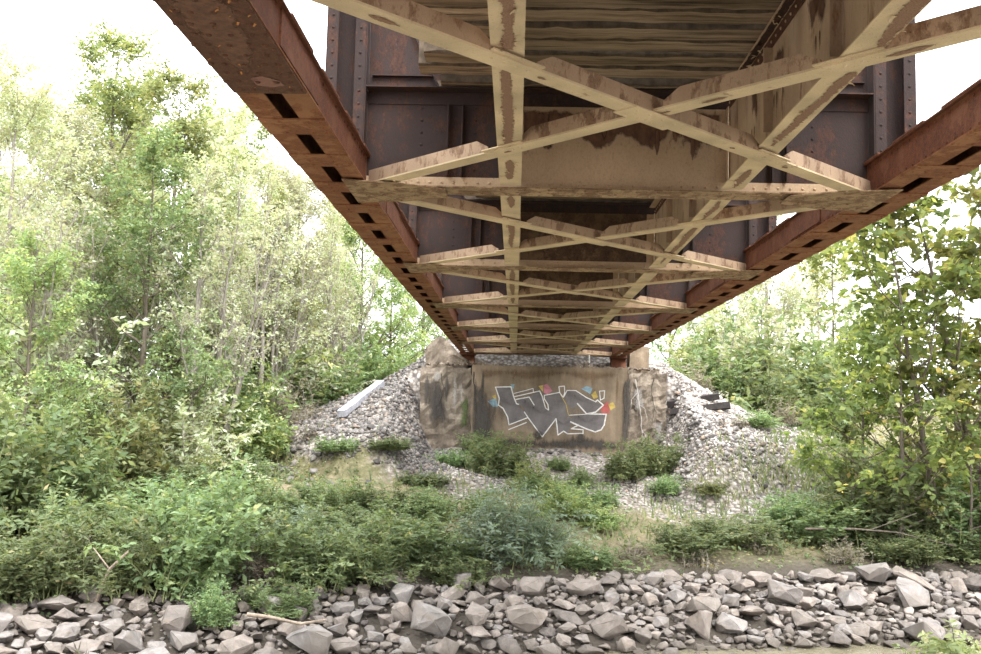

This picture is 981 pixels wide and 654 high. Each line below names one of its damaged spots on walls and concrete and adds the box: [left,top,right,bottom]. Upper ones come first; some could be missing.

peeling [493,0,517,50]
rust [809,0,825,48]
peeling [877,0,940,57]
peeling [498,70,518,180]
peeling [506,225,515,248]